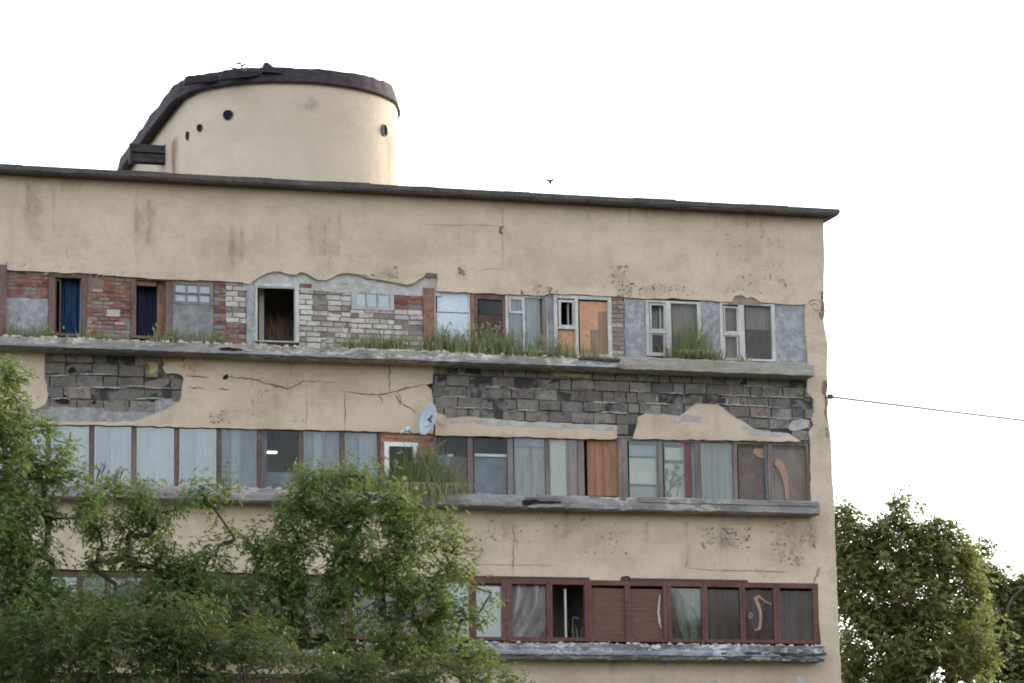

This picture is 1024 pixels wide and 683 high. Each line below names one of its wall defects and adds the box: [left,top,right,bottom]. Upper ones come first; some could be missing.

spalling [243,266,446,296]
spalling [29,353,206,426]
crack [187,365,425,430]
spalling [426,367,829,457]